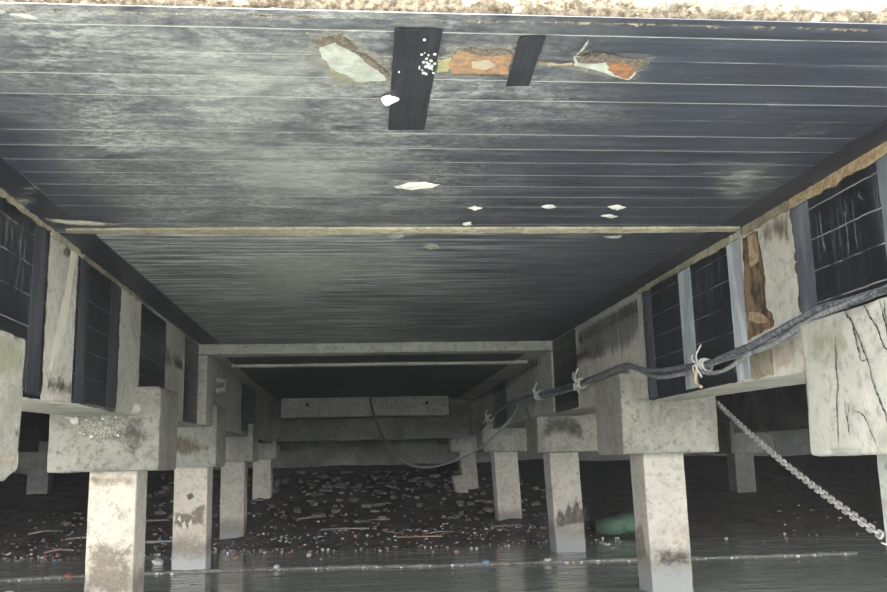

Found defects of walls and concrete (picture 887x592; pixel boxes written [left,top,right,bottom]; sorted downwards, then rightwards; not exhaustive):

spalling [307,33,391,85]
spalling [436,47,514,76]
spalling [569,53,649,80]
crack [813,299,887,447]
damp [544,418,582,435]
damp [88,545,130,592]
damp [659,550,689,566]